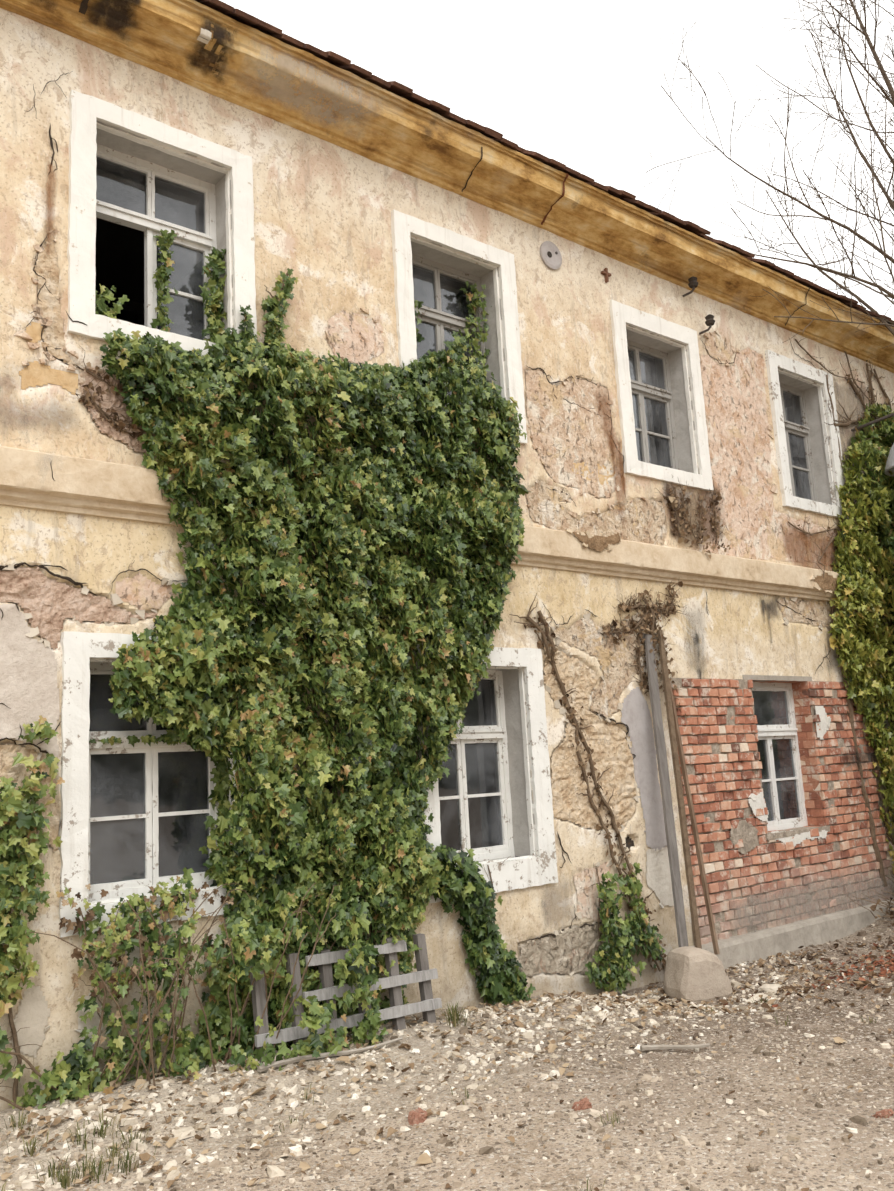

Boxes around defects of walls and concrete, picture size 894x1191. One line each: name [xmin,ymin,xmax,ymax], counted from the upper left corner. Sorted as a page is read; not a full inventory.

damp [89,0,140,39]
damp [190,20,233,80]
flaking render [14,228,166,453]
flaking render [525,369,668,551]
flaking render [0,563,182,650]
crack [0,703,61,754]
flaking render [543,613,674,908]
flaking render [518,859,617,978]